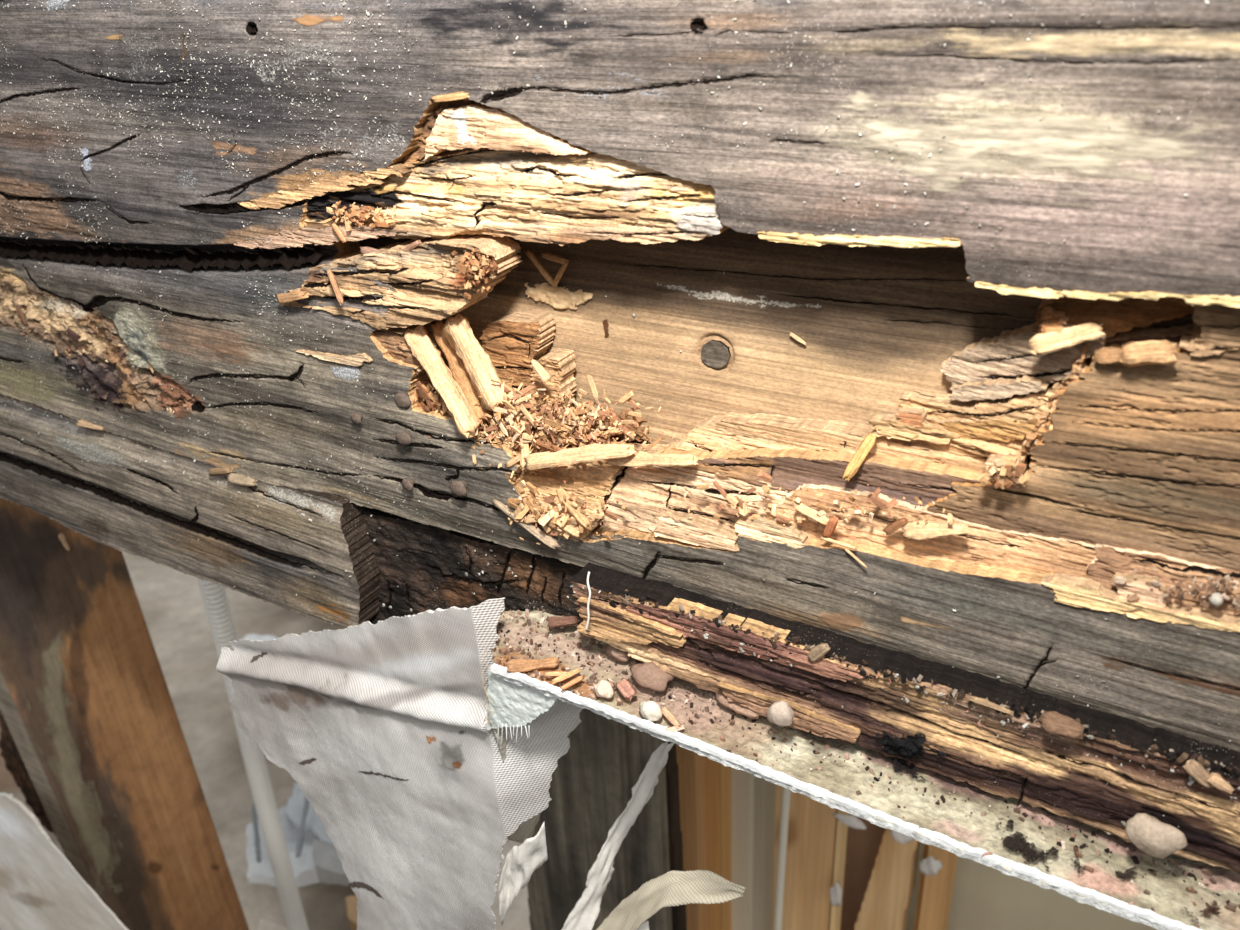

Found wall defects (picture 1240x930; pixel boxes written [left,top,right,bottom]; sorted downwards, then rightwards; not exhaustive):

crack [0,57,194,102]
crack [479,74,791,102]
crack [181,149,497,226]
crack [0,134,441,322]
water stain [52,352,127,411]
crack [187,365,315,414]
crack [787,579,827,589]
crack [682,630,1240,815]
water stain [875,731,947,780]
water stain [995,818,1085,873]
water stain [1142,806,1221,844]
water stain [1115,867,1137,882]